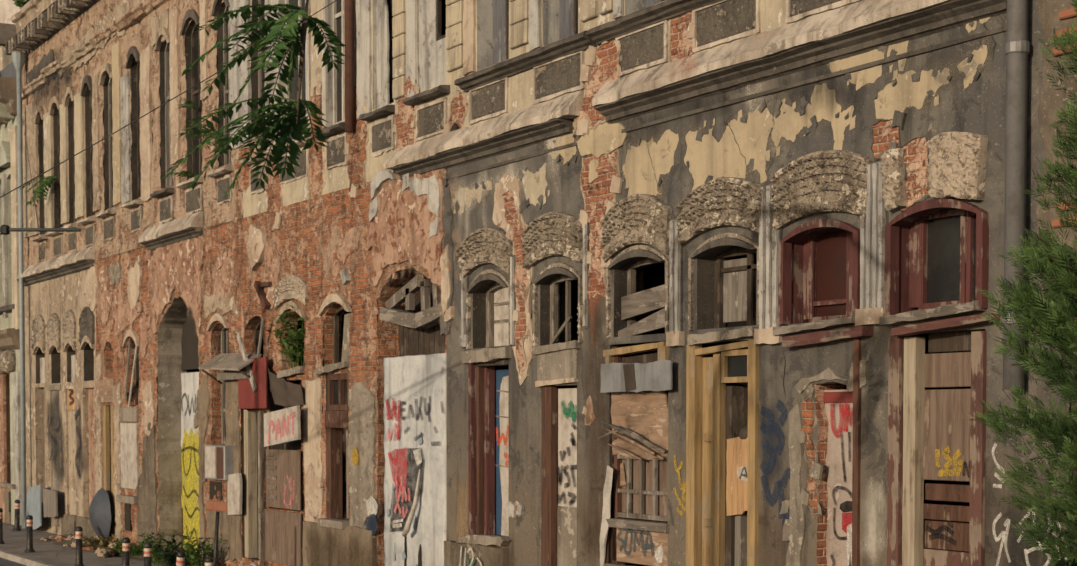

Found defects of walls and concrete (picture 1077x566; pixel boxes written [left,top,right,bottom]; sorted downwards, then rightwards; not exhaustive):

flaking render [668,12,697,62]
flaking render [308,81,326,211]
flaking render [344,84,369,198]
flaking render [392,76,419,150]
peeling [369,198,379,222]
peeling [429,217,439,239]
peeling [443,40,987,377]
peeling [440,306,455,335]
peeling [847,360,868,392]
flaking render [780,394,823,541]